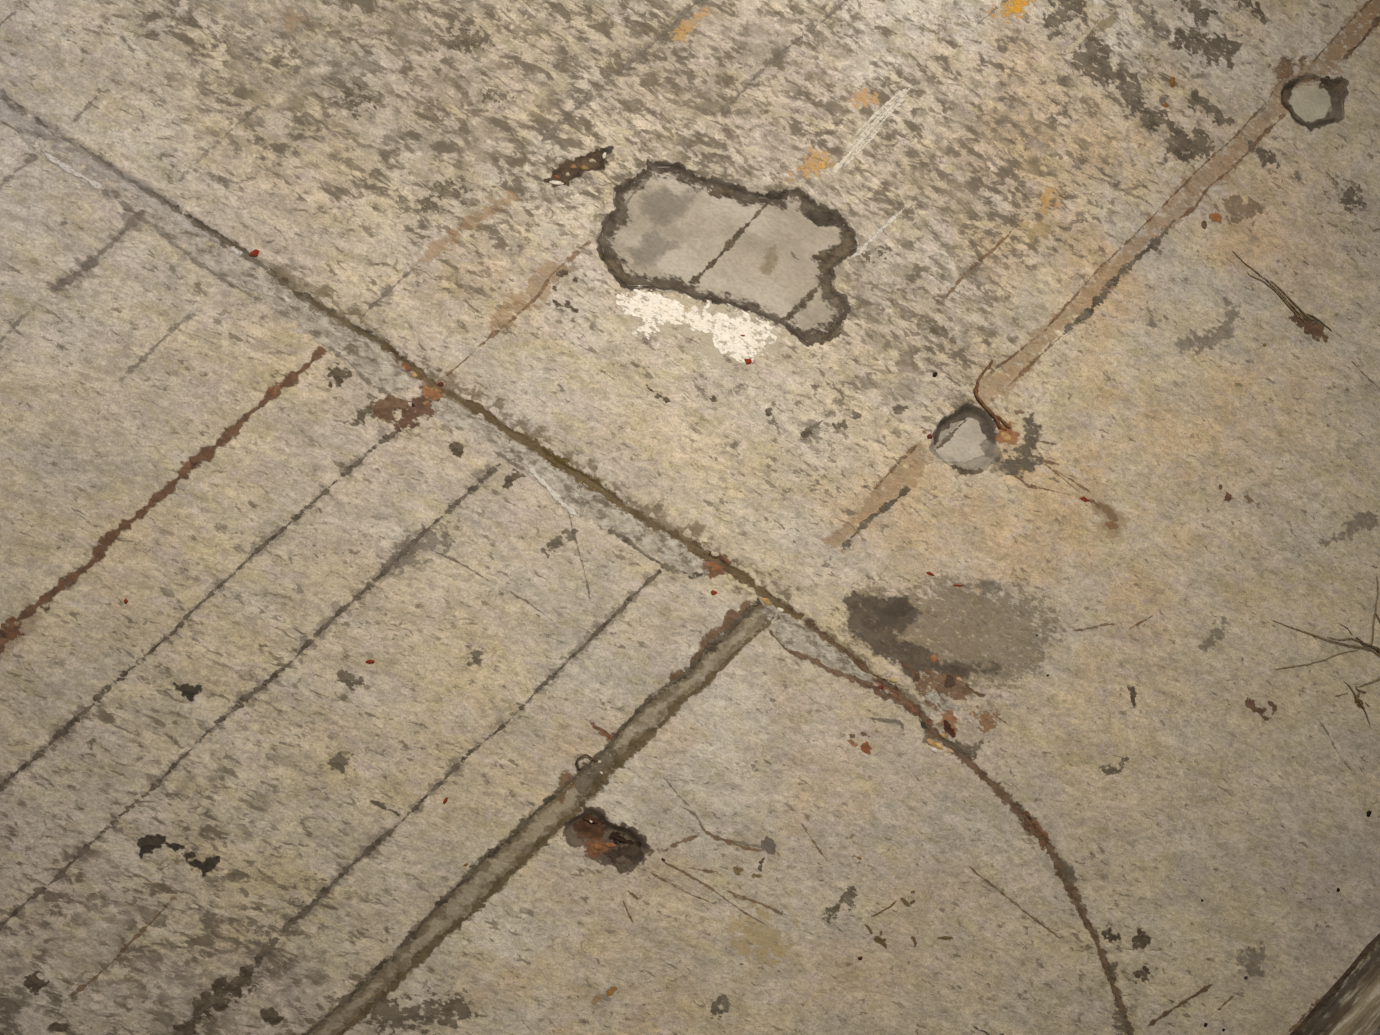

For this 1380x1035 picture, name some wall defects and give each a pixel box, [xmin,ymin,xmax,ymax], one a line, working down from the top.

spalling [544,146,614,187]
spalling [597,159,859,347]
leakage [616,285,803,380]
rust [0,346,327,654]
crack [0,90,1134,1035]
leakage [843,590,1001,683]
crack [1074,616,1152,631]
crack [1149,984,1212,1026]